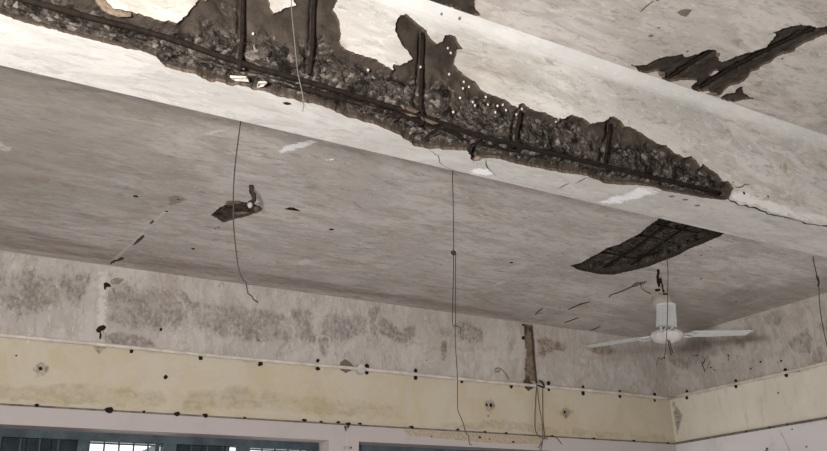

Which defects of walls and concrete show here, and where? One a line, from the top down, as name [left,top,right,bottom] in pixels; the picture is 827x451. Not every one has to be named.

spalling [631,24,827,102]
spalling [0,0,734,200]
spalling [211,201,262,222]
crack [729,184,827,227]
spalling [570,218,725,275]
damp [0,264,95,325]
damp [91,272,418,362]
damp [429,317,488,362]